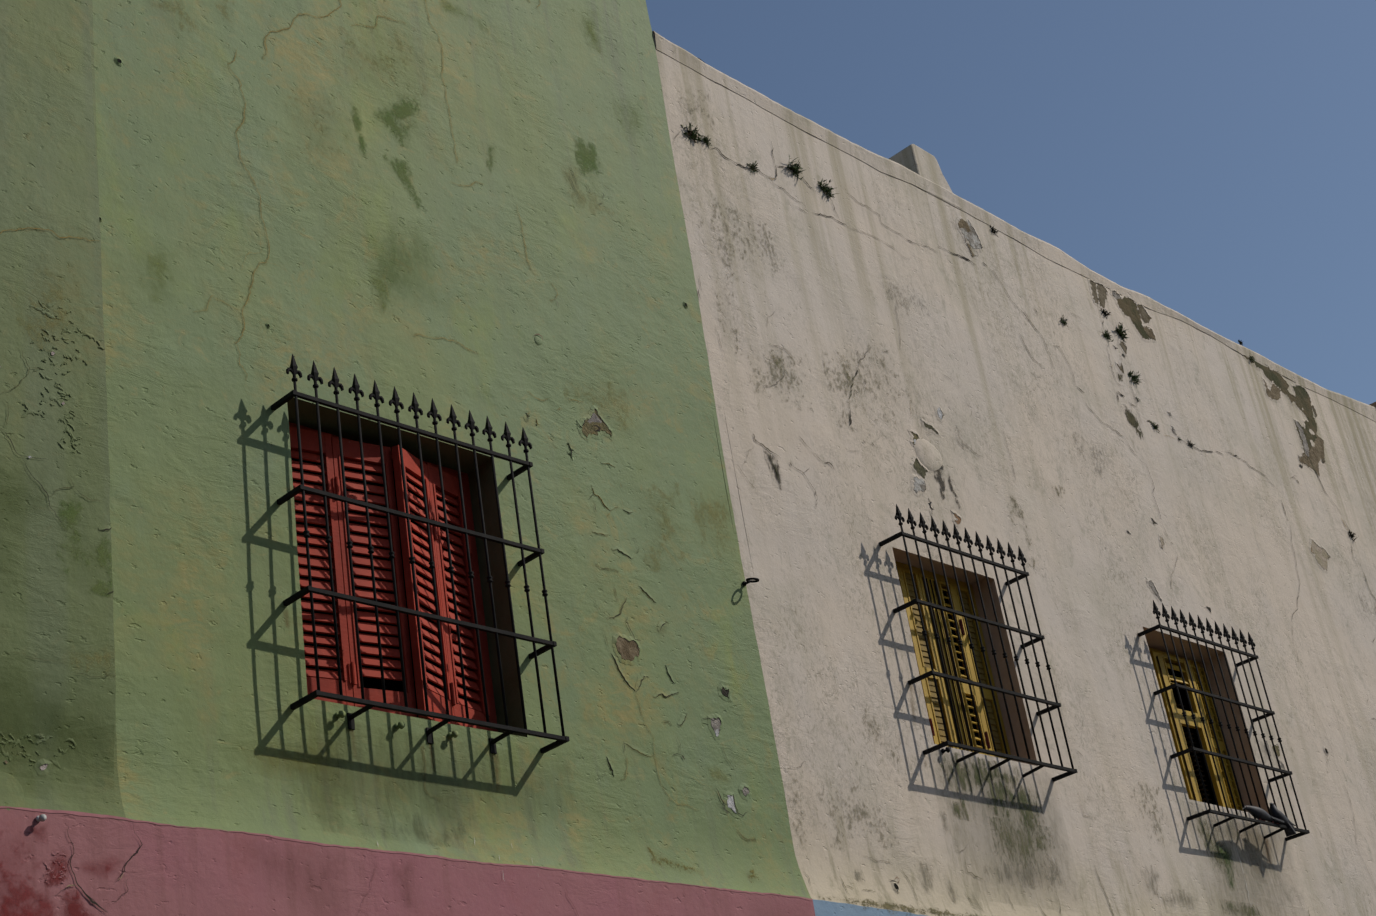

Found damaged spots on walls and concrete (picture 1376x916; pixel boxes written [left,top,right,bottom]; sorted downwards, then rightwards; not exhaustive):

crack [206,0,471,379]
spalling [956,216,984,258]
spalling [1087,278,1158,381]
peeling [576,404,615,442]
spalling [907,404,945,497]
crack [711,146,1301,668]
spalling [1242,354,1326,483]
peeling [612,620,643,666]
peeling [703,683,732,741]
peeling [716,783,752,818]
peeling [0,861,89,916]
crack [36,825,142,912]